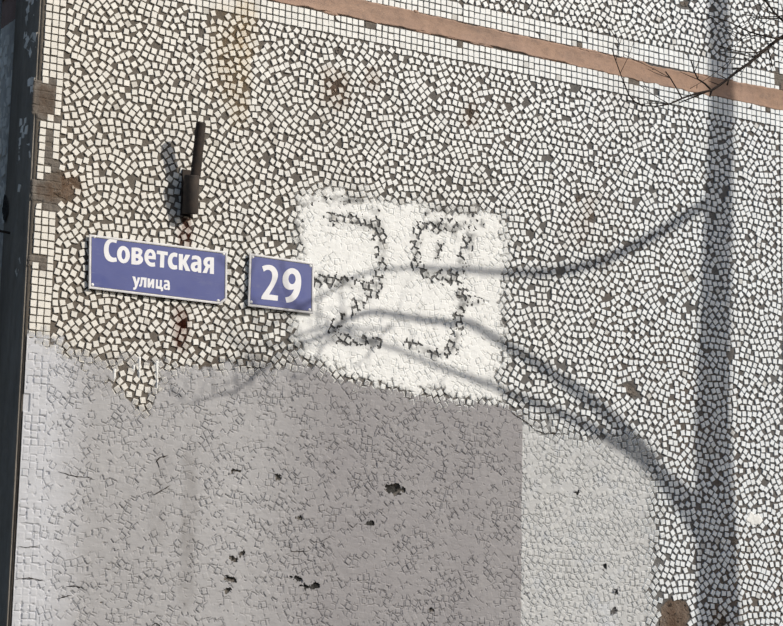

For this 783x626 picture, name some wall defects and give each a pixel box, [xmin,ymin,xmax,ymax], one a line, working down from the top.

spalling [55,175,81,200]
corrosion [176,311,187,348]
spalling [660,599,690,626]